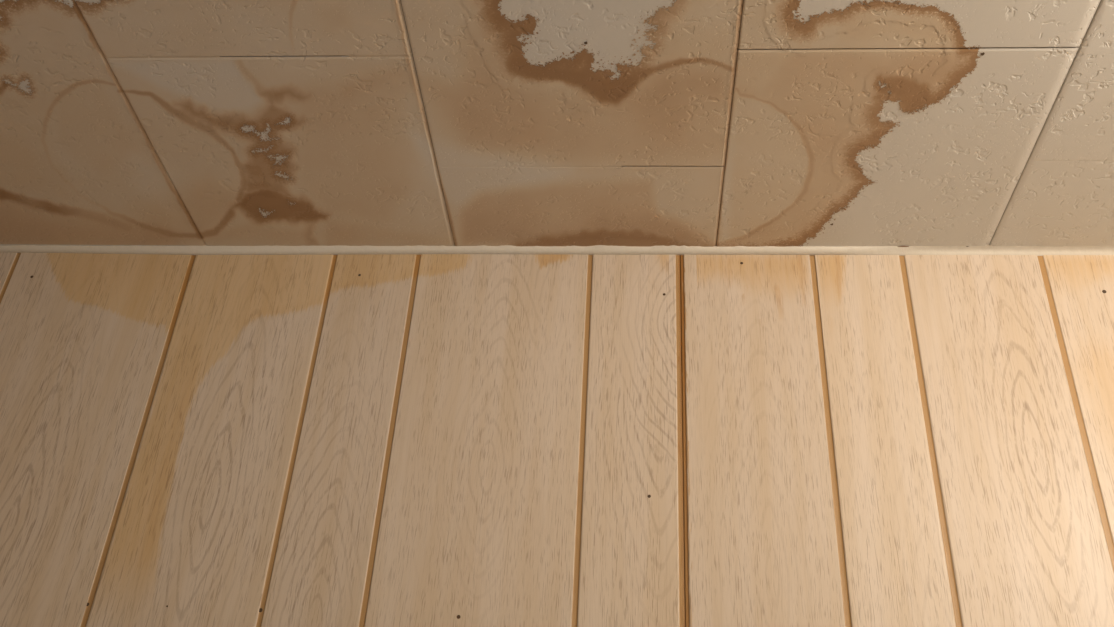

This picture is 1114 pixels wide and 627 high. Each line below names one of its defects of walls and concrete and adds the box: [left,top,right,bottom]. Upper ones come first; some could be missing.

damp [0,0,982,355]
damp [30,253,491,627]